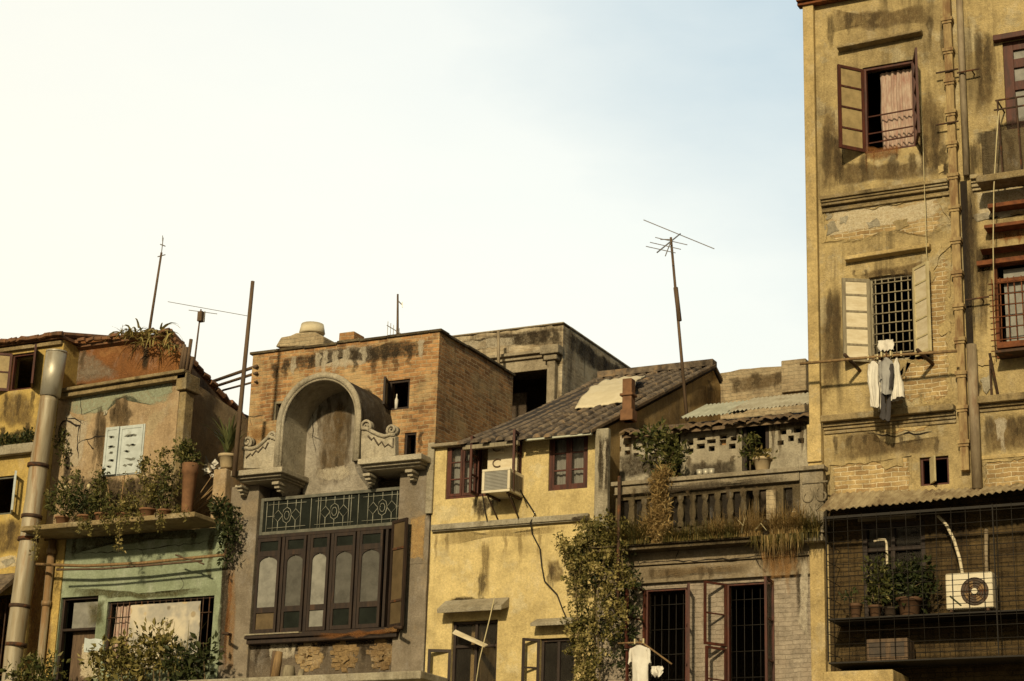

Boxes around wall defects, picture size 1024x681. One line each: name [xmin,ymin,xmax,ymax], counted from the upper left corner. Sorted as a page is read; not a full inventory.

leakage [828,7,944,47]
leakage [822,96,948,183]
flaking render [820,196,955,409]
leakage [272,340,424,376]
leakage [0,392,35,439]
flaking render [825,453,917,501]
leakage [474,498,498,515]
flaking render [295,639,392,673]